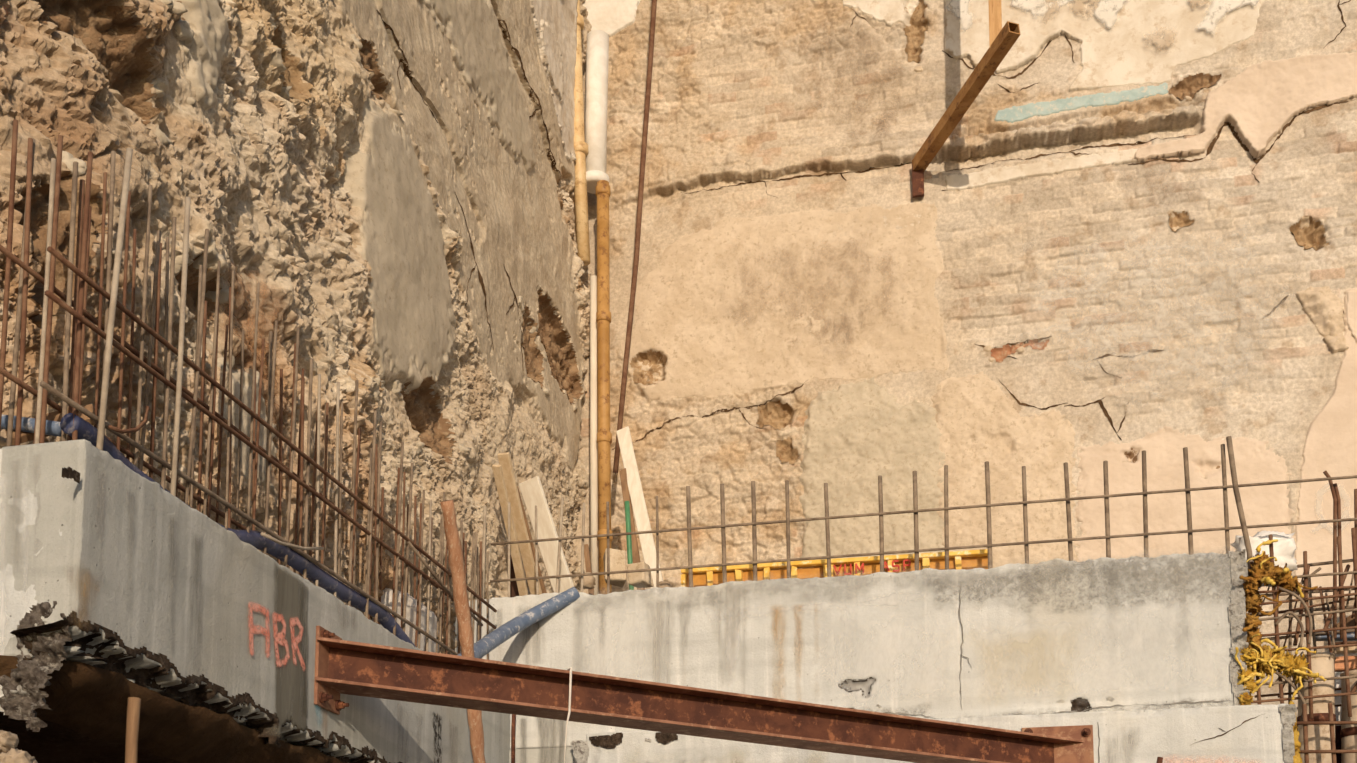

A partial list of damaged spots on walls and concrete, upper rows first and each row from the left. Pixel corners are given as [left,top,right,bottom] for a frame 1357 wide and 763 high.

crack [377,10,438,123]
peeling [843,0,928,72]
peeling [944,0,1357,163]
crack [680,163,910,197]
crack [942,99,1356,191]
spalling [0,119,471,655]
spalling [518,289,584,411]
crack [978,336,1167,441]
spalling [0,601,402,763]
spalling [460,436,1357,763]
crack [883,584,971,719]
crack [1015,700,1263,762]